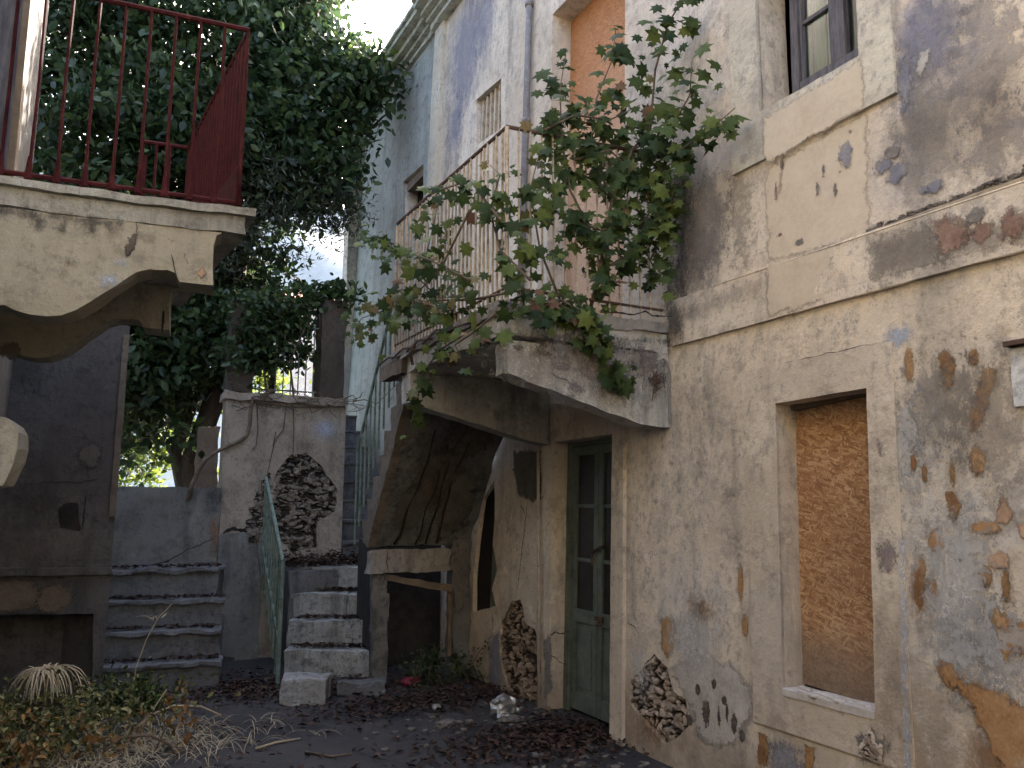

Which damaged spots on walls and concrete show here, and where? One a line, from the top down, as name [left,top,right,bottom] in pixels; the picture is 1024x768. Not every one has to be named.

peeling [872,145,909,186]
peeling [866,164,1024,255]
peeling [904,347,915,382]
peeling [938,349,956,389]
peeling [964,348,1000,478]
spalling [244,452,337,557]
peeling [513,448,542,502]
peeling [945,463,962,522]
peeling [978,550,1024,666]
spalling [392,600,666,768]
peeling [627,616,753,750]
peeling [936,660,1024,768]